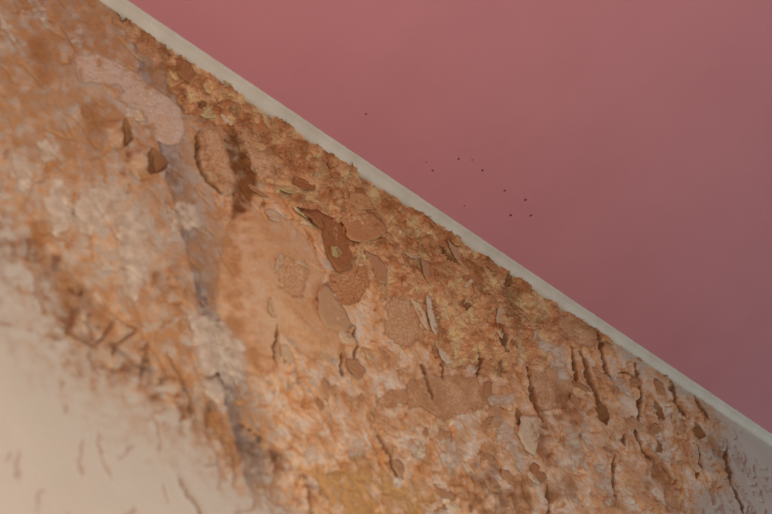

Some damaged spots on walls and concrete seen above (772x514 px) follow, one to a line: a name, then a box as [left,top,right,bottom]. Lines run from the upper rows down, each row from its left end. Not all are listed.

leakage [0,0,150,245]
leakage [59,206,258,437]
leakage [154,193,210,249]
flaking render [71,13,568,378]
flaking render [241,182,729,514]